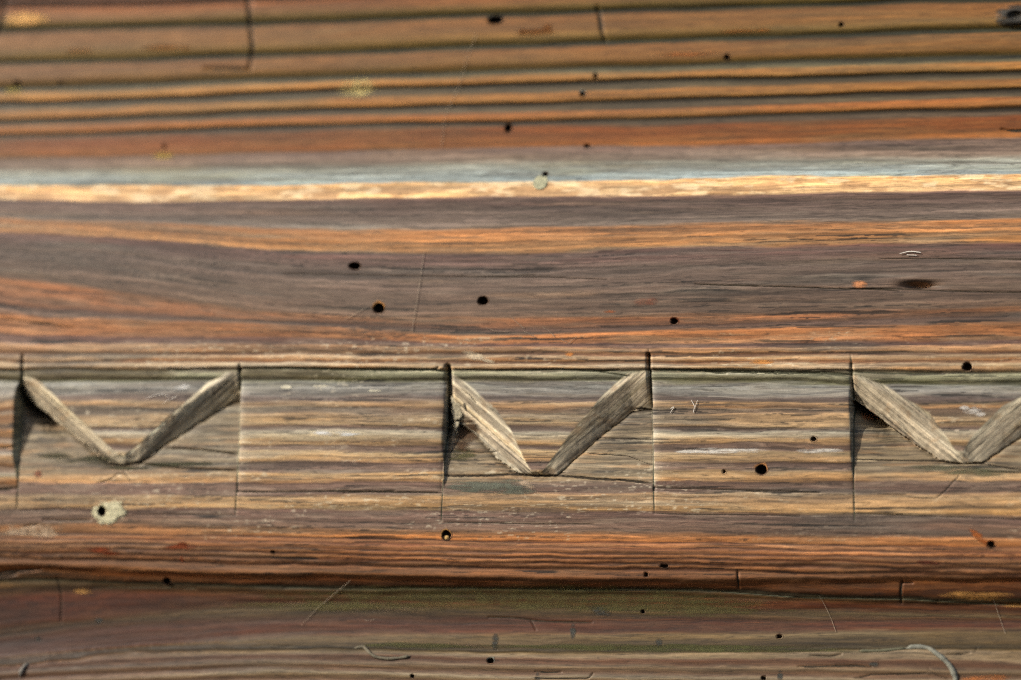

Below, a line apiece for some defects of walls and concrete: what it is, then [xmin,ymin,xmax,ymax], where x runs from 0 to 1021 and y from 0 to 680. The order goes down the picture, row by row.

crack [0,0,8,33]
crack [206,0,254,70]
crack [0,437,820,527]